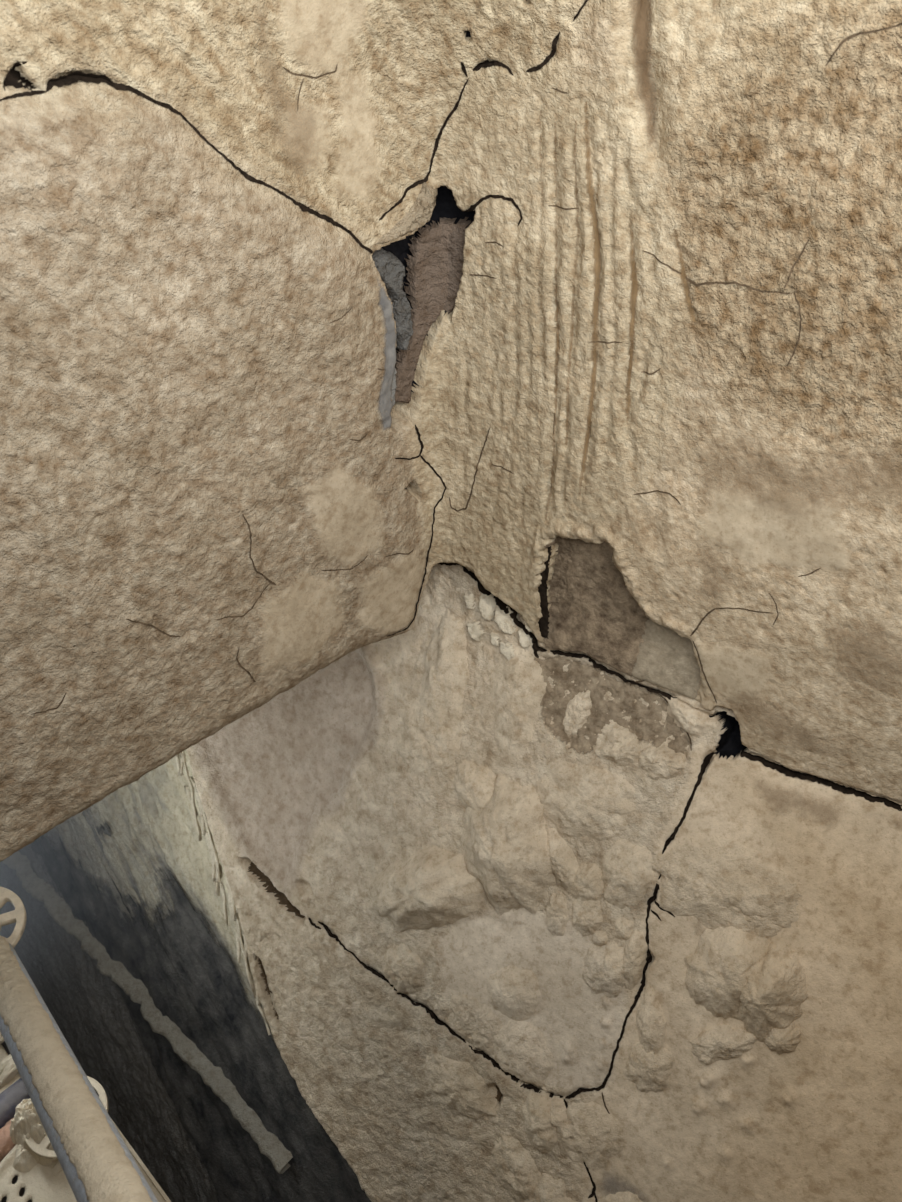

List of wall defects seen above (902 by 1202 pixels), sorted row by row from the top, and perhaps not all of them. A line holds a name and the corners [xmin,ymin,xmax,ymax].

crack [0,0,681,703]
crack [33,693,66,714]
spalling [464,536,701,754]
crack [308,593,902,1114]
crack [584,1162,598,1202]